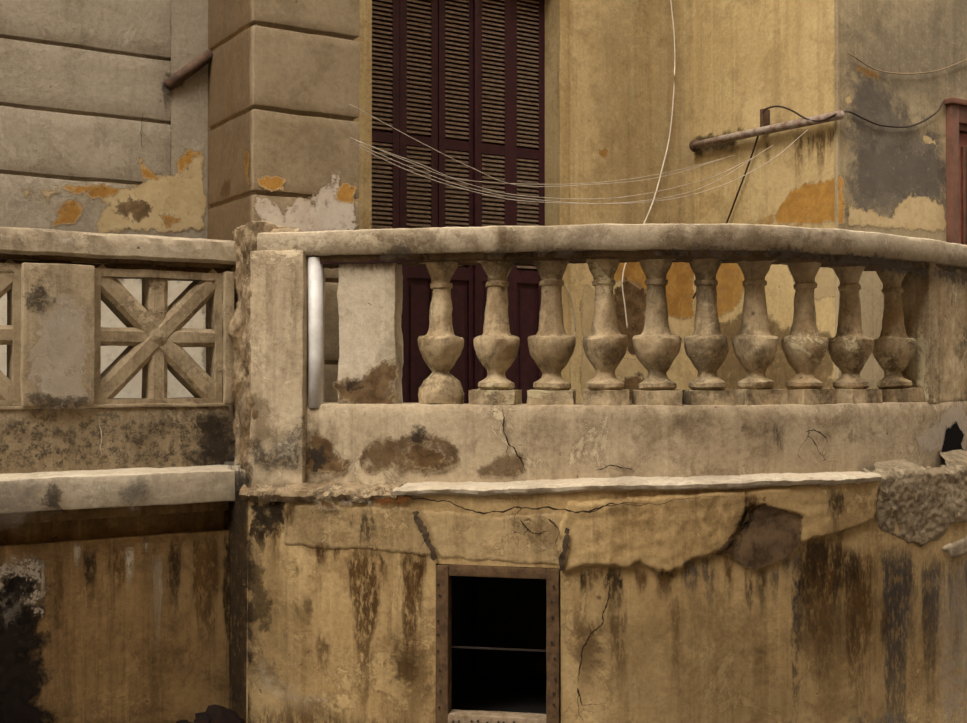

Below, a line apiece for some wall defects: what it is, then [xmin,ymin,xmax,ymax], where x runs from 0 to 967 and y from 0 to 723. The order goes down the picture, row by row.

peeling [24,149,207,234]
peeling [775,175,946,233]
spalling [228,150,359,483]
peeling [614,262,648,403]
crack [475,409,528,479]
water stain [0,392,341,723]
water stain [348,553,385,652]
water stain [402,554,426,642]
crack [403,495,728,571]
crack [577,585,610,723]
spalling [716,505,803,569]
water stain [746,492,940,723]